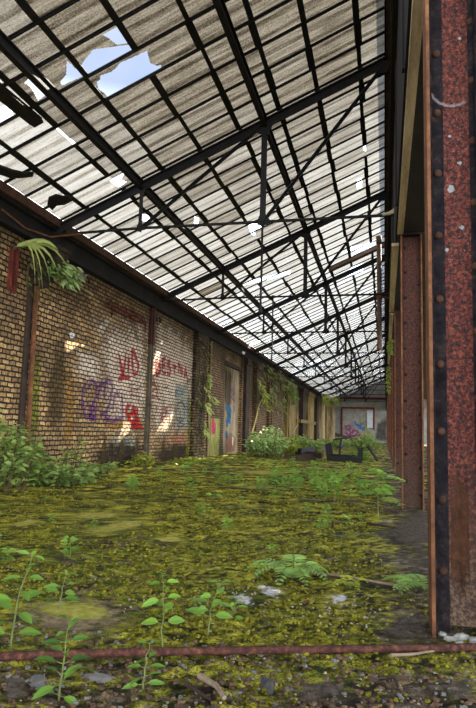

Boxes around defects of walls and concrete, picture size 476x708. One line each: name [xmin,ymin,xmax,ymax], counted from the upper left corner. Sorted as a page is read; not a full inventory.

rust [450,482,470,590]